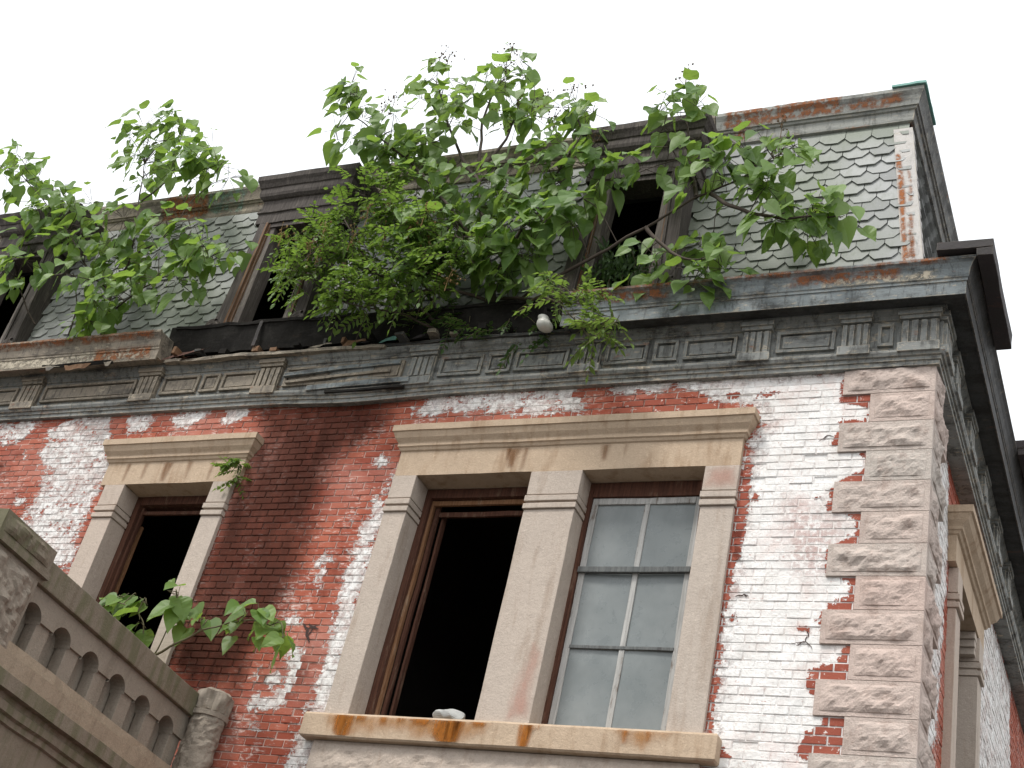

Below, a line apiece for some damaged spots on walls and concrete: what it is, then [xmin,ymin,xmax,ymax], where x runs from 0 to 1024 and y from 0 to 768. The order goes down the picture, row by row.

corrosion [725,94,901,139]
peeling [126,414,156,436]
peeling [409,389,592,419]
peeling [0,417,113,573]
peeling [600,372,871,768]
peeling [282,453,397,768]
peeling [244,646,306,739]
corrosion [334,715,366,735]
corrosion [382,717,486,742]
corrosion [518,724,540,746]